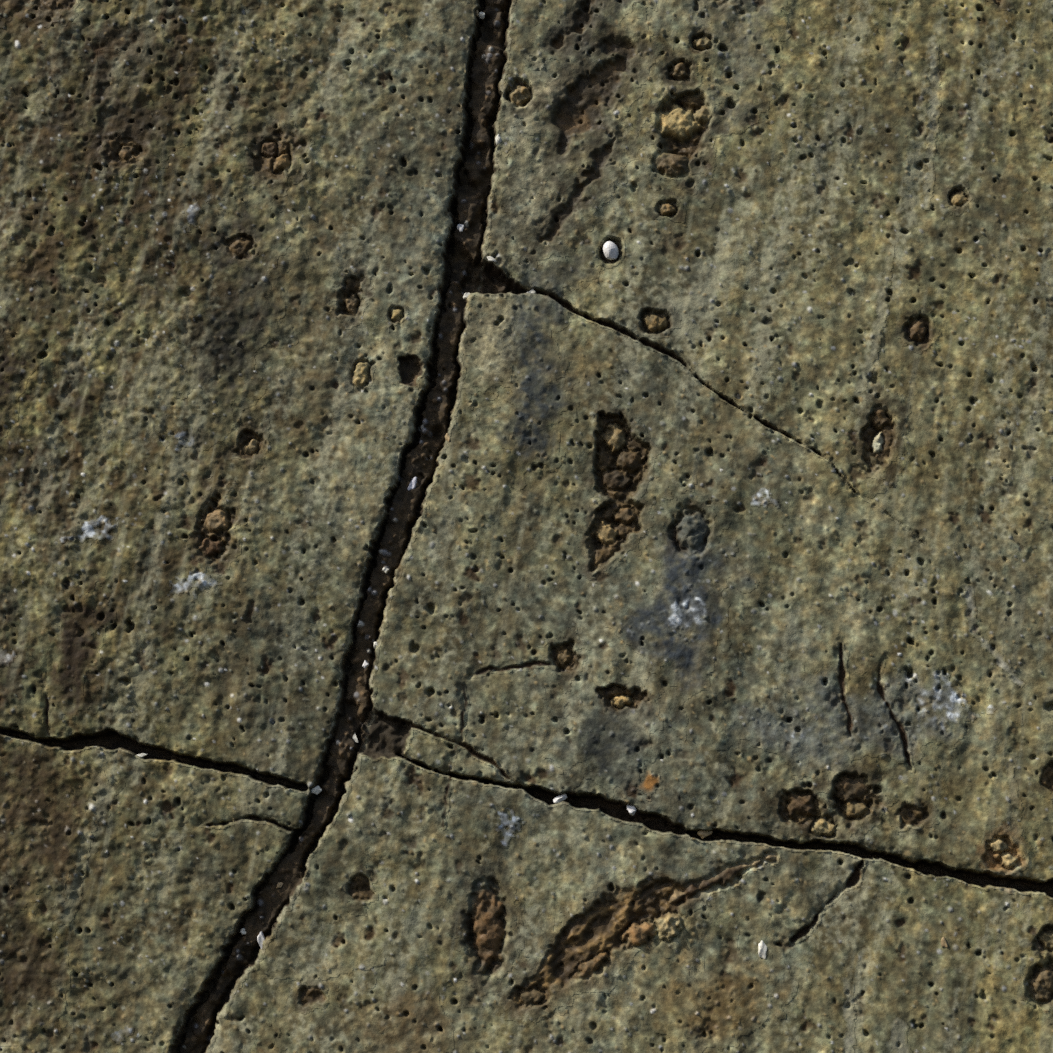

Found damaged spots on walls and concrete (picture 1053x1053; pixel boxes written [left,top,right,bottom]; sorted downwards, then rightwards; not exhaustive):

spalling [462,0,748,421]
crack [474,258,926,546]
crack [0,0,516,1053]
spalling [571,401,732,583]
crack [469,659,554,678]
crack [440,682,1053,946]
crack [837,643,856,740]
spalling [766,756,944,842]
crack [875,661,915,773]
spalling [1035,752,1053,799]
spalling [446,850,780,1026]